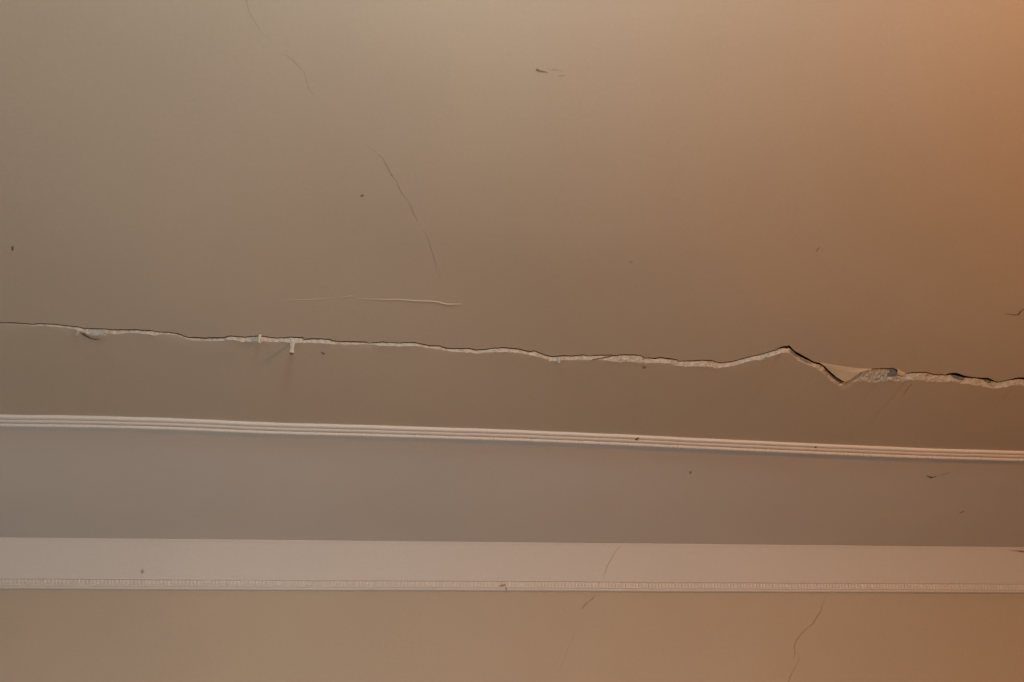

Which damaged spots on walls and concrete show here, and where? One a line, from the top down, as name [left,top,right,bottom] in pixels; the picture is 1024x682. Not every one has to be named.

crack [0,322,1024,389]
peeling [819,362,871,382]